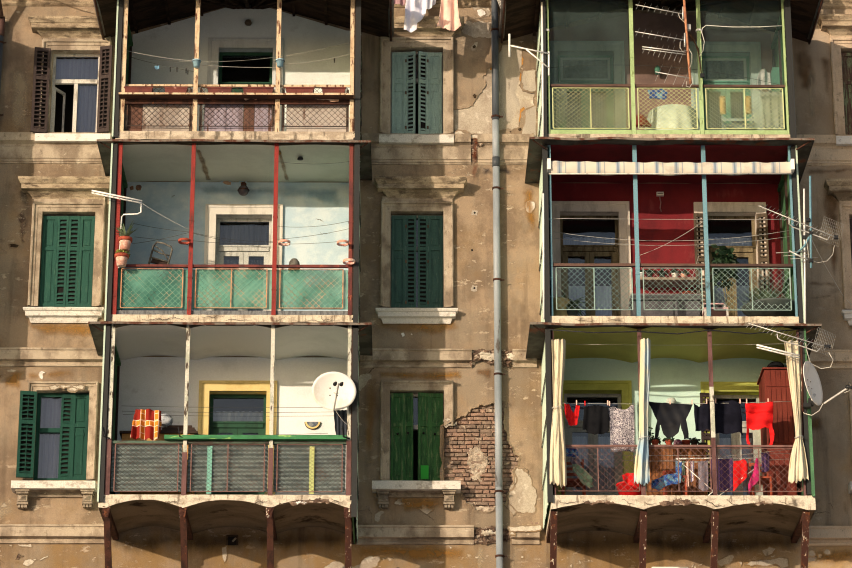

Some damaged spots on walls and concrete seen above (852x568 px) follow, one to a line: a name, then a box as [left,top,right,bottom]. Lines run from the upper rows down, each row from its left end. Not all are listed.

peeling [461,7,492,52]
peeling [453,42,537,163]
spalling [439,390,542,545]
peeling [323,555,382,568]